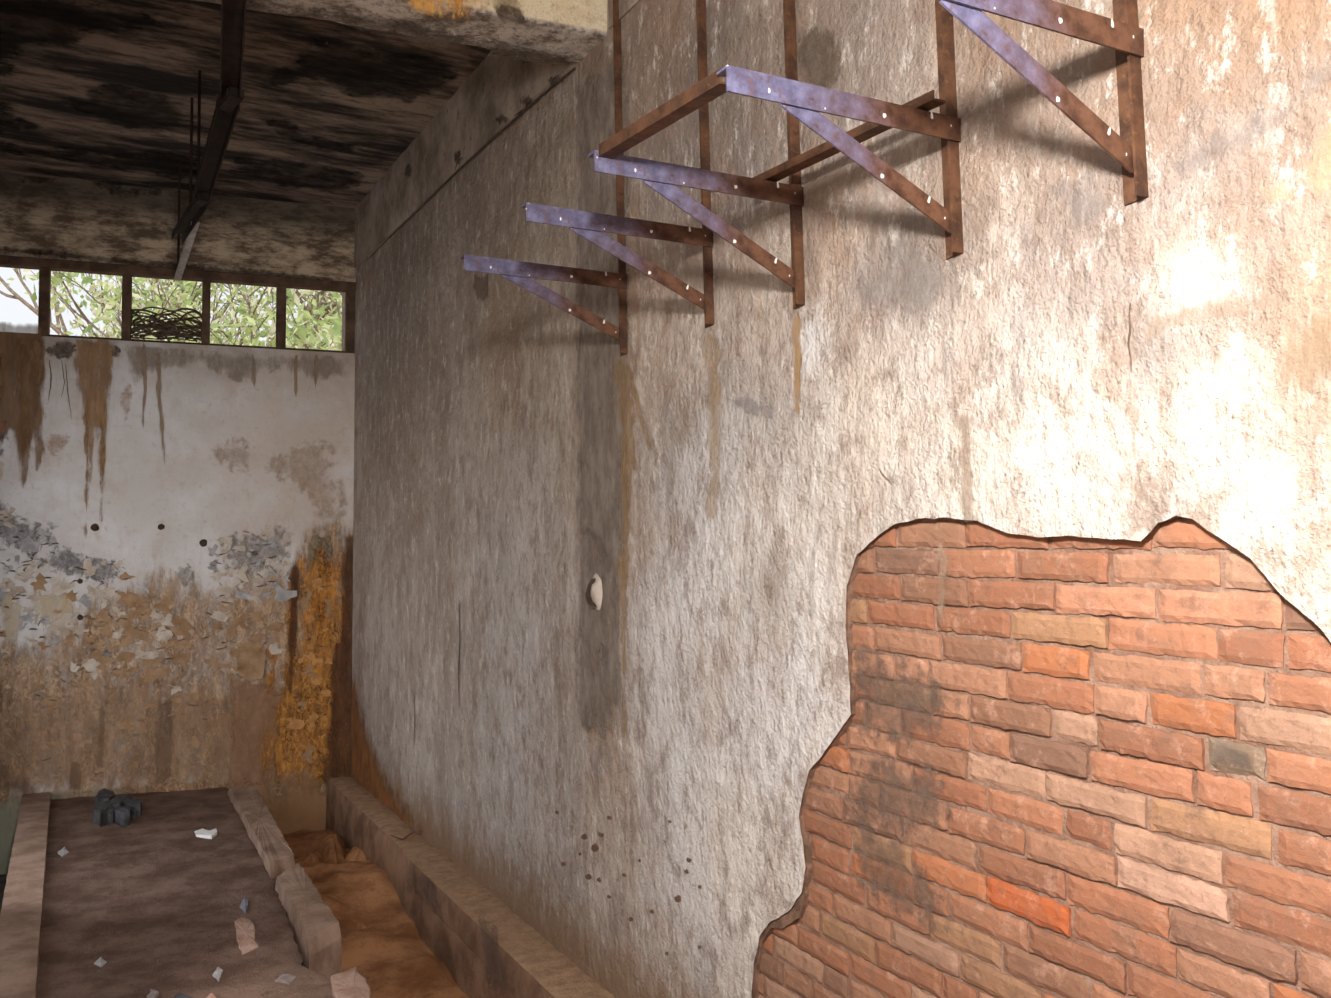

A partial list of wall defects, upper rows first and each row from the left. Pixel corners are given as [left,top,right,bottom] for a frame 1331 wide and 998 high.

corrosion [411,0,466,16]
damp [577,57,629,216]
damp [132,344,191,455]
damp [208,353,341,395]
damp [0,506,117,581]
damp [576,232,629,736]
peeling [0,507,335,763]
corrosion [261,535,410,827]
flaking render [751,516,1331,998]